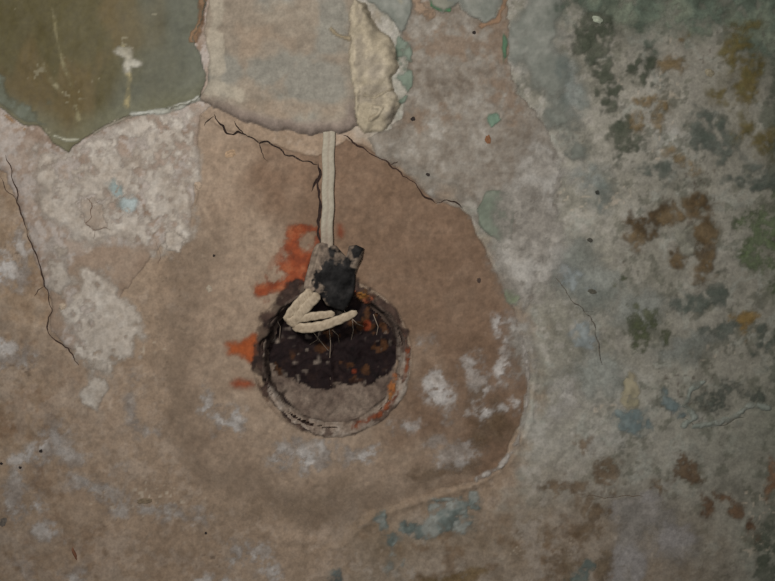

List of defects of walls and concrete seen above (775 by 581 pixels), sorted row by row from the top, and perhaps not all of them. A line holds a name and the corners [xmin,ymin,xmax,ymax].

peeling [0,0,207,152]
mould [556,0,775,111]
crack [204,114,322,243]
crack [344,135,461,207]
mould [607,115,642,157]
mould [690,110,738,164]
crack [1,155,79,365]
corrosion [255,225,320,296]
flaking render [165,0,586,522]
mould [671,285,728,313]
corrosion [228,334,257,363]
corrosion [355,333,410,427]